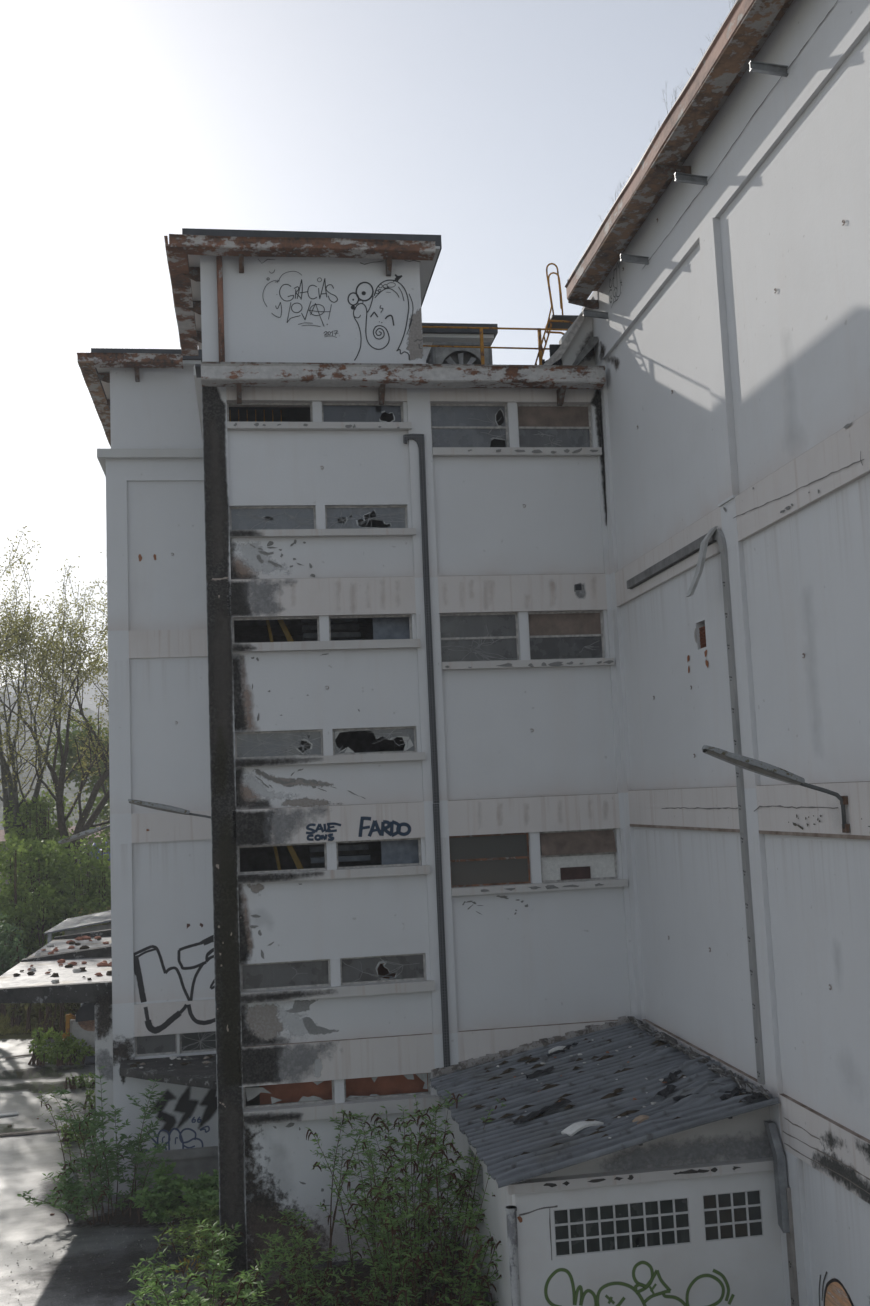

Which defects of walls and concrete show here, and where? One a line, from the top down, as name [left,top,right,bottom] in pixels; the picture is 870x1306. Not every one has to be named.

peeling [250,540,315,577]
peeling [255,739,365,799]
water stain [813,1133,870,1204]